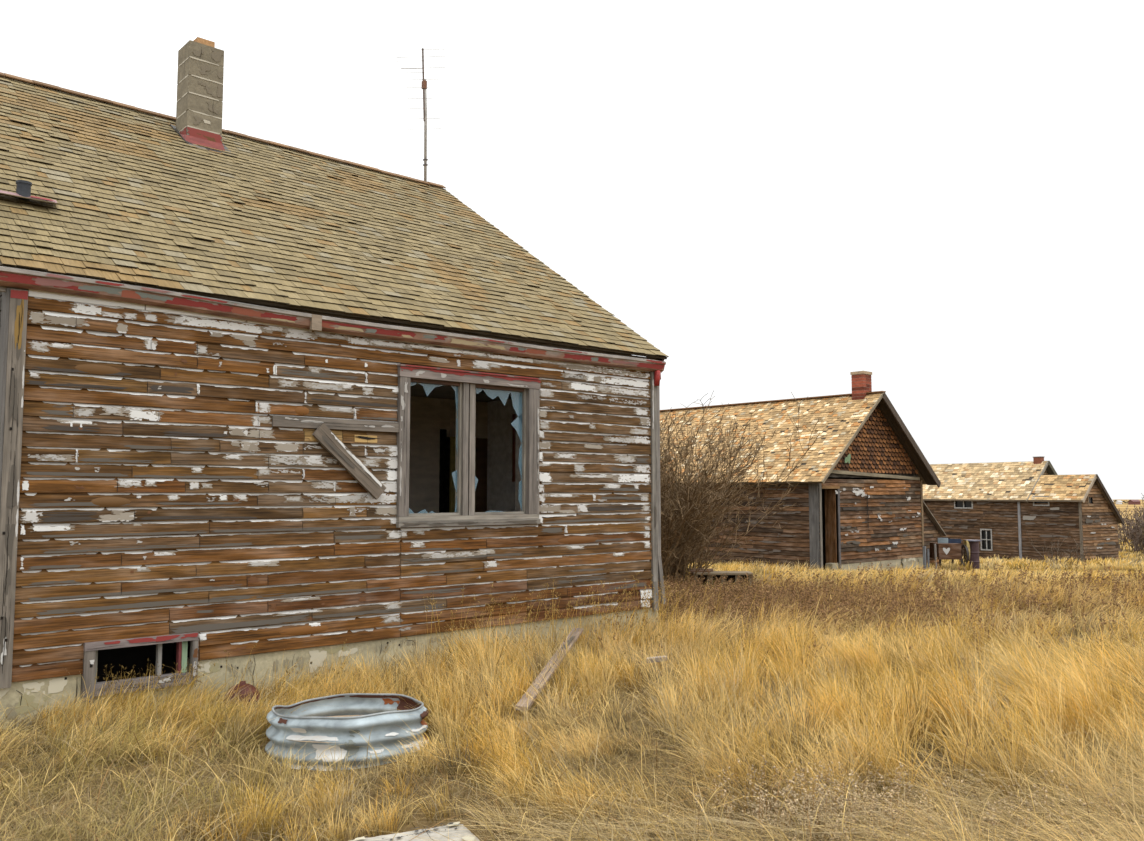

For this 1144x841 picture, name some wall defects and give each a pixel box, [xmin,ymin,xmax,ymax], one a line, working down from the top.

peeling [0,272,665,578]
peeling [276,596,323,626]
peeling [640,589,652,608]
spalling [309,648,358,673]